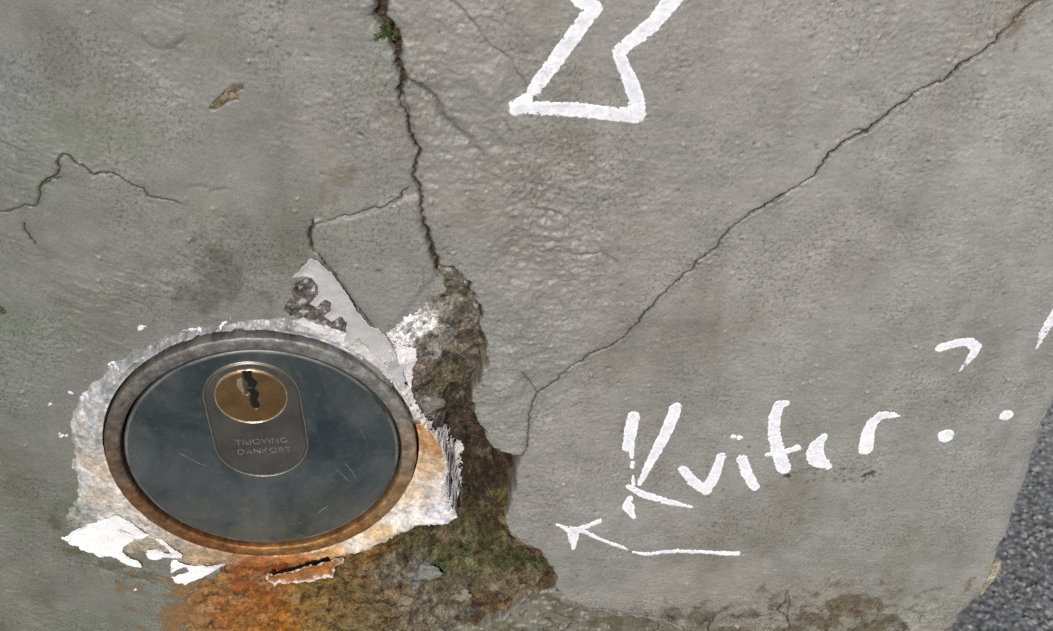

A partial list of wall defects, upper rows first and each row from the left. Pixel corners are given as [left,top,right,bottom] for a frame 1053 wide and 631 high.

crack [0,153,178,244]
crack [308,0,482,322]
crack [523,0,1035,454]
rust [159,577,209,631]
spalling [61,258,684,631]